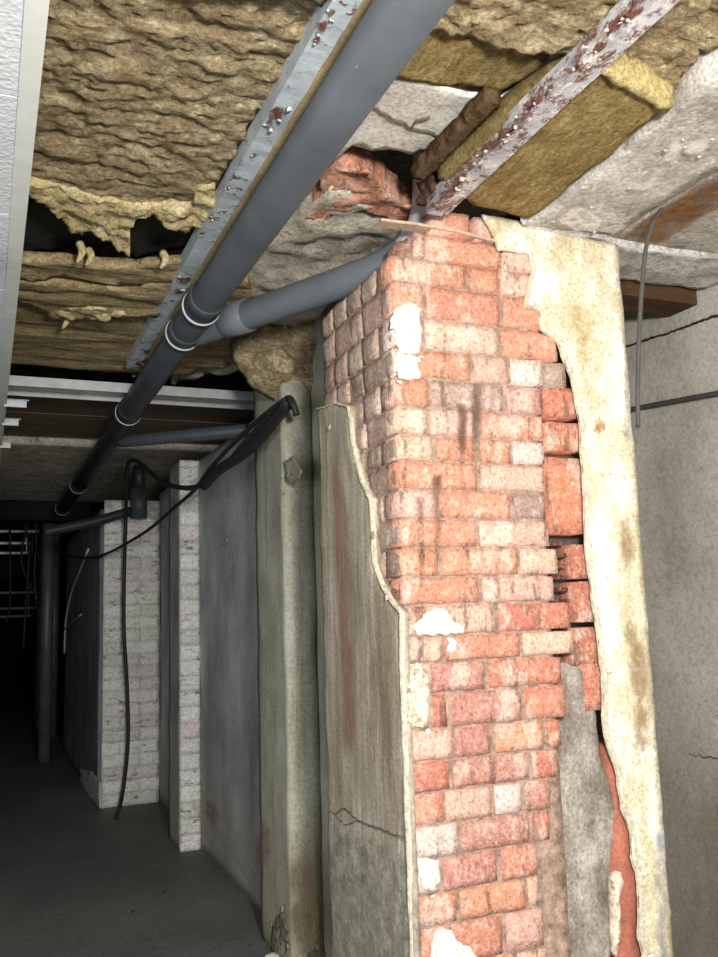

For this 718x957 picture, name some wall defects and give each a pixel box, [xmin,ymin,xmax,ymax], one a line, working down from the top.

rust [313,10,335,44]
rust [607,0,645,32]
rust [265,107,284,129]
rust [416,42,606,206]
spalling [306,145,412,221]
peeling [552,206,603,234]
spalling [387,241,410,258]
flaking render [523,252,654,957]
flaking render [316,402,423,957]
crack [329,808,405,838]